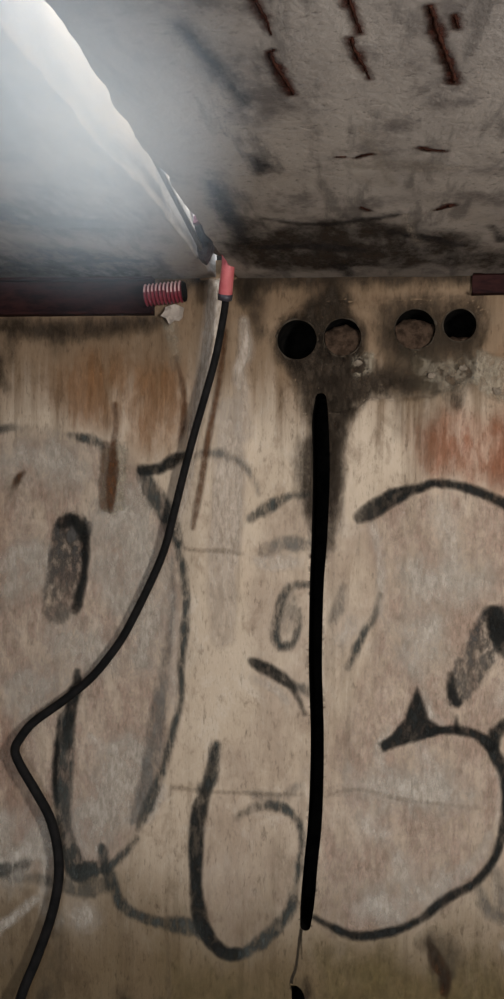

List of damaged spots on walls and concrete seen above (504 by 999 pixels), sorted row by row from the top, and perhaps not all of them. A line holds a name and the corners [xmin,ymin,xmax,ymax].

rust [250,0,272,35]
rust [266,49,298,96]
rust [341,0,371,80]
rust [426,4,463,85]
water stain [207,180,504,533]